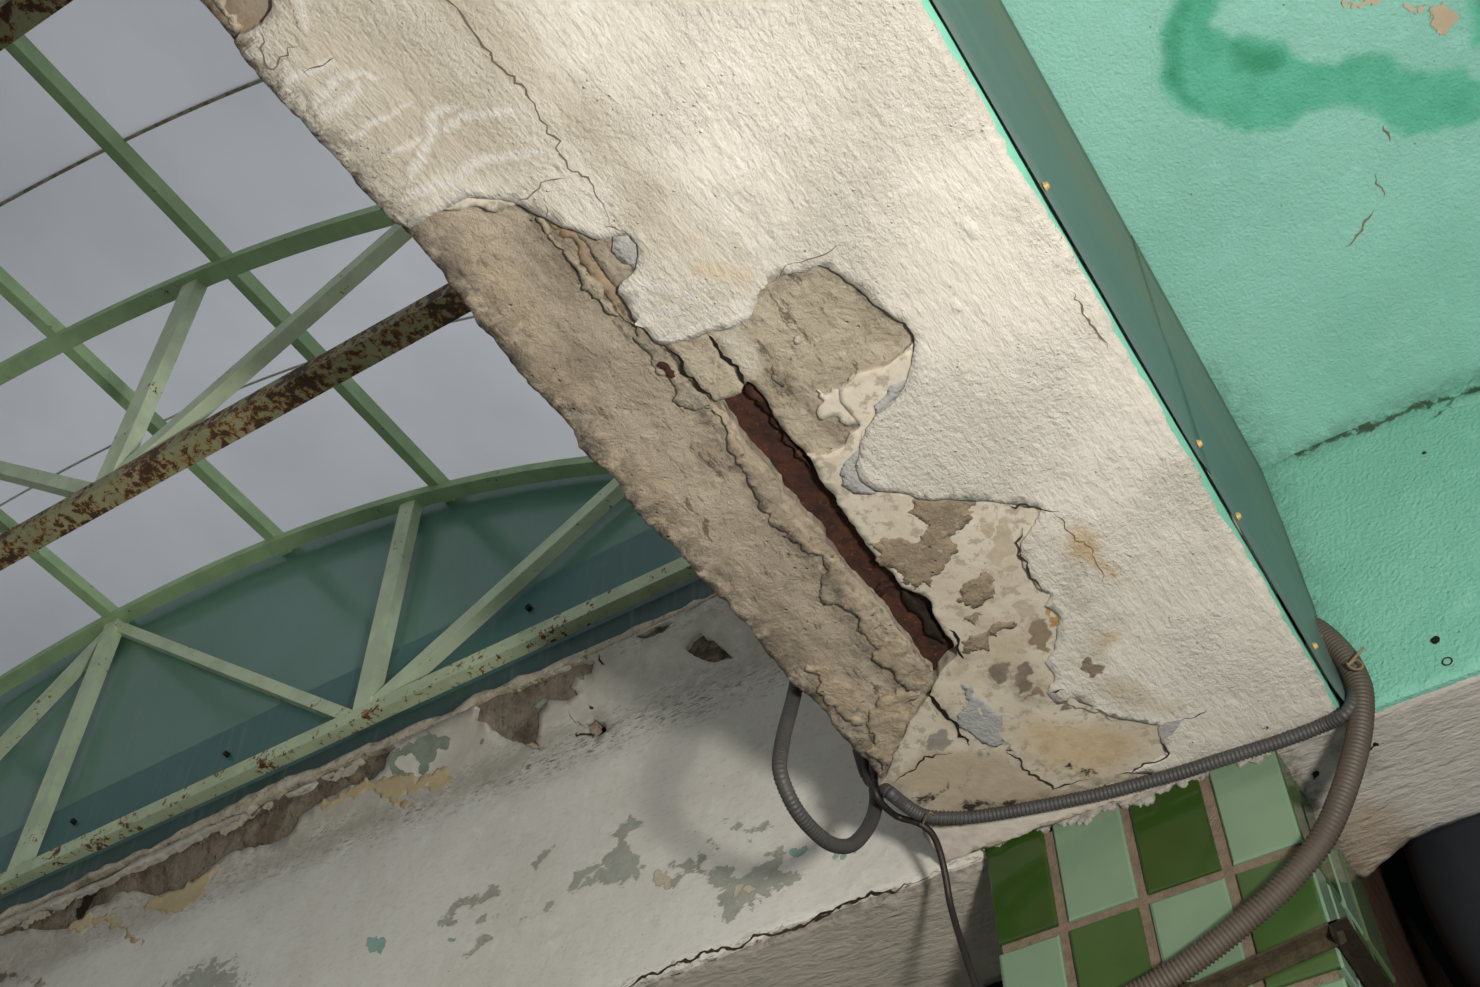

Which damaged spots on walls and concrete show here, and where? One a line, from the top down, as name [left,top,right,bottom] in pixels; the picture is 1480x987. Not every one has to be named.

flaking render [200,0,272,40]
peeling [1403,2,1459,36]
crack [446,0,622,232]
leakage [1150,0,1480,146]
flaking render [402,197,1180,827]
crack [950,630,964,659]
crack [894,688,969,783]
crack [1008,753,1082,790]
crack [1052,689,1122,722]
flaking render [0,731,455,946]
peeling [544,814,807,924]
peeling [422,884,501,958]